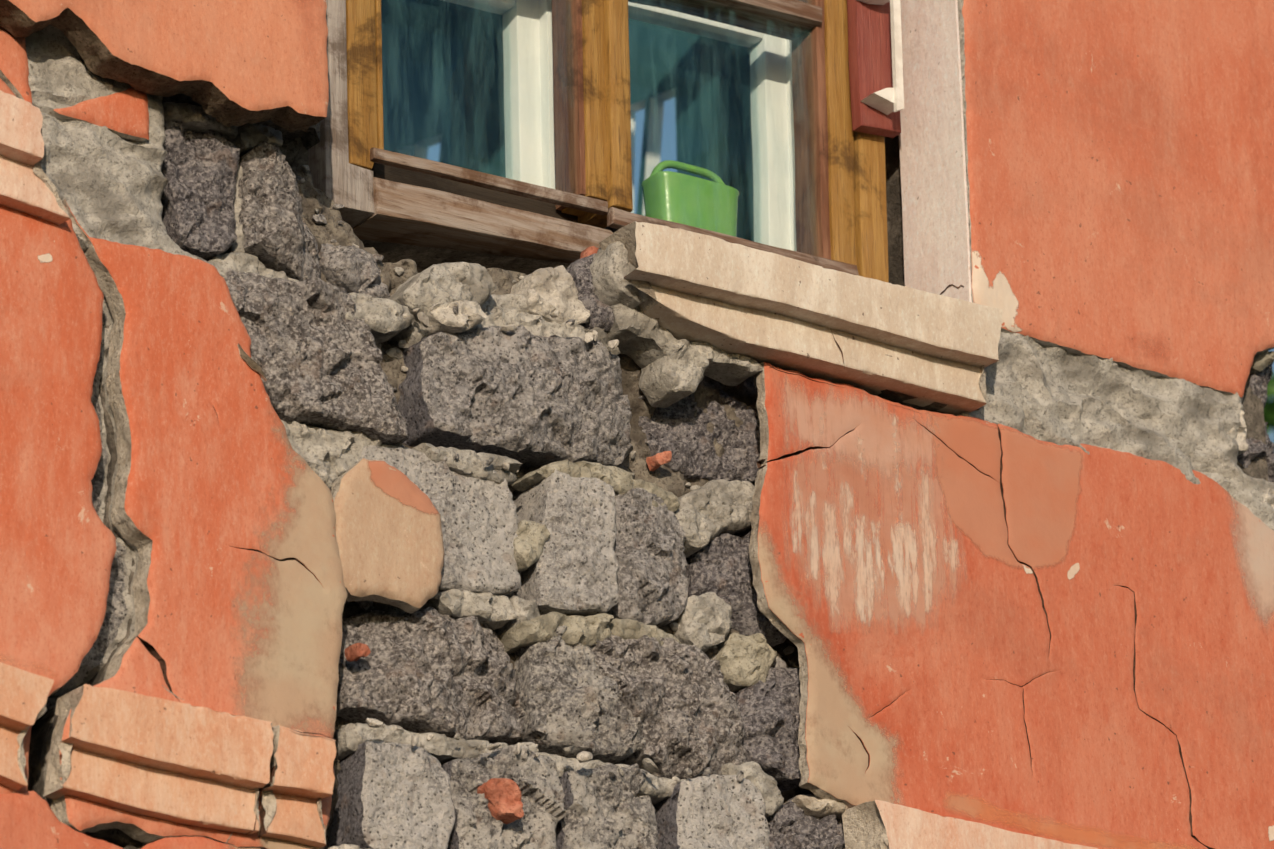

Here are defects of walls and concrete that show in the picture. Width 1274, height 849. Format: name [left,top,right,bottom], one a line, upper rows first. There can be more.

crack [42,286,139,808]
spalling [25,25,899,849]
crack [757,450,807,468]
spalling [785,251,1274,626]
crack [226,765,276,843]